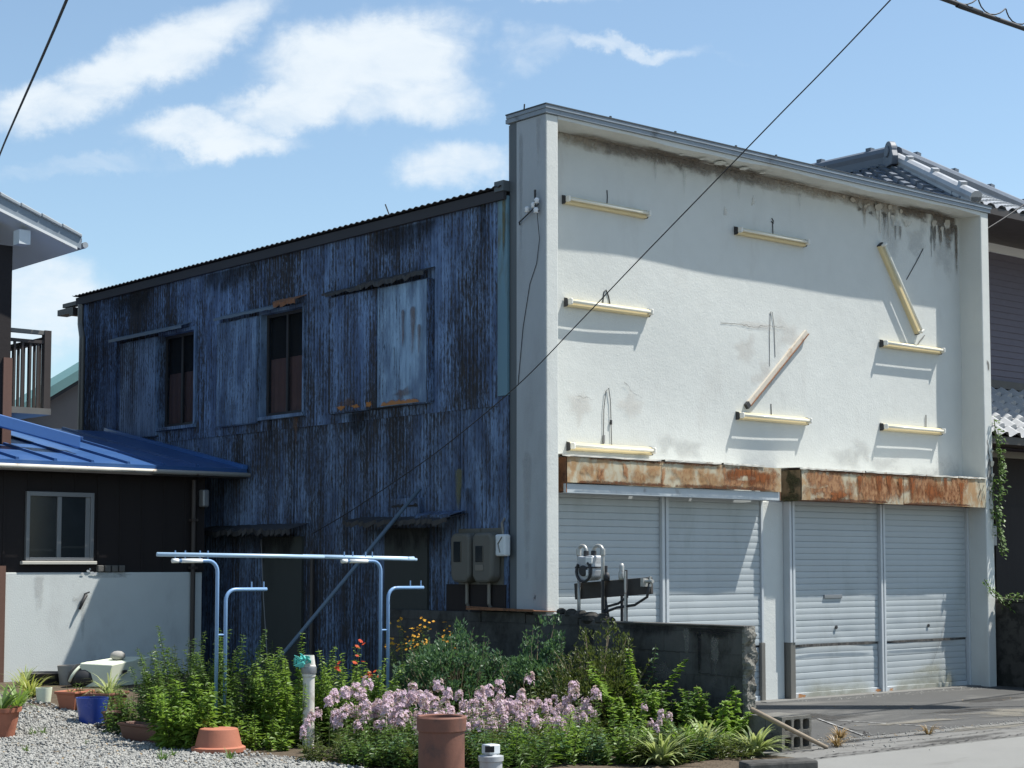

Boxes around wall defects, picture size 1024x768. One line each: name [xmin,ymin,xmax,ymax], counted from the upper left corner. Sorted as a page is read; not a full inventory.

leakage [558,131,958,268]
rust [383,307,420,367]
rust [337,389,419,433]
rust [579,458,778,491]
rust [803,470,970,506]